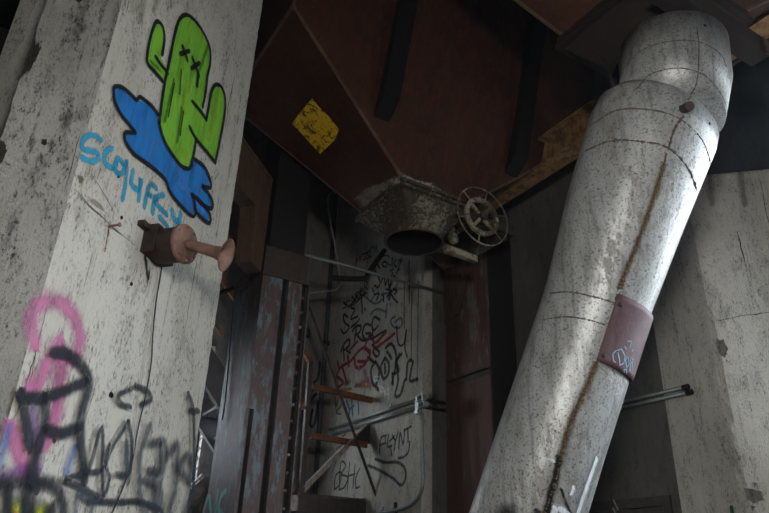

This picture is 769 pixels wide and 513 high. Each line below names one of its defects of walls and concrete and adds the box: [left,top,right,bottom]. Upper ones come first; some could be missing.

rust [617,161,666,289]
spalling [716,338,728,358]
rust [559,361,599,466]
spalling [744,482,764,510]